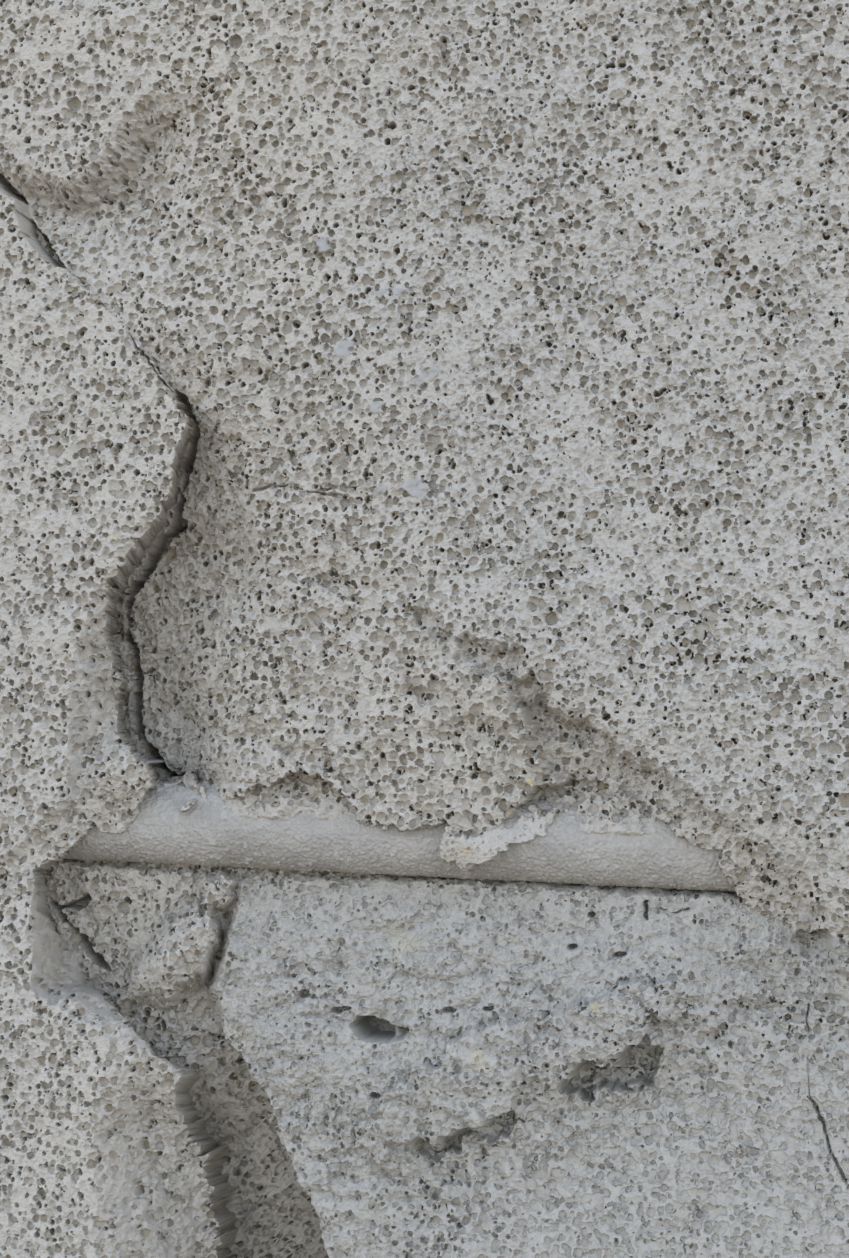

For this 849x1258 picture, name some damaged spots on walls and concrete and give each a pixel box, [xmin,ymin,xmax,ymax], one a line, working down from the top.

crack [0,172,201,779]
spalling [30,324,849,1258]